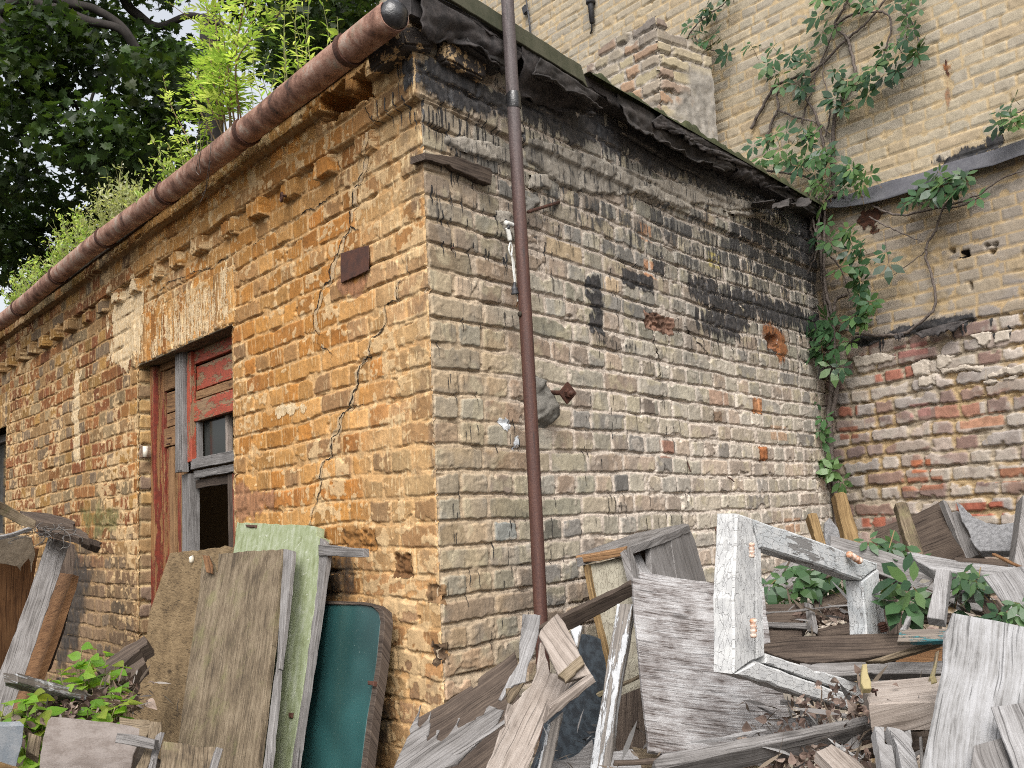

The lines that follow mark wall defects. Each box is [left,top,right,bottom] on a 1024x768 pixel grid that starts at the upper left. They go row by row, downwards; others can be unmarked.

leakage [522,112,547,144]
leakage [430,166,490,269]
crack [309,254,410,526]
leakage [640,204,808,404]
rust [763,323,787,362]